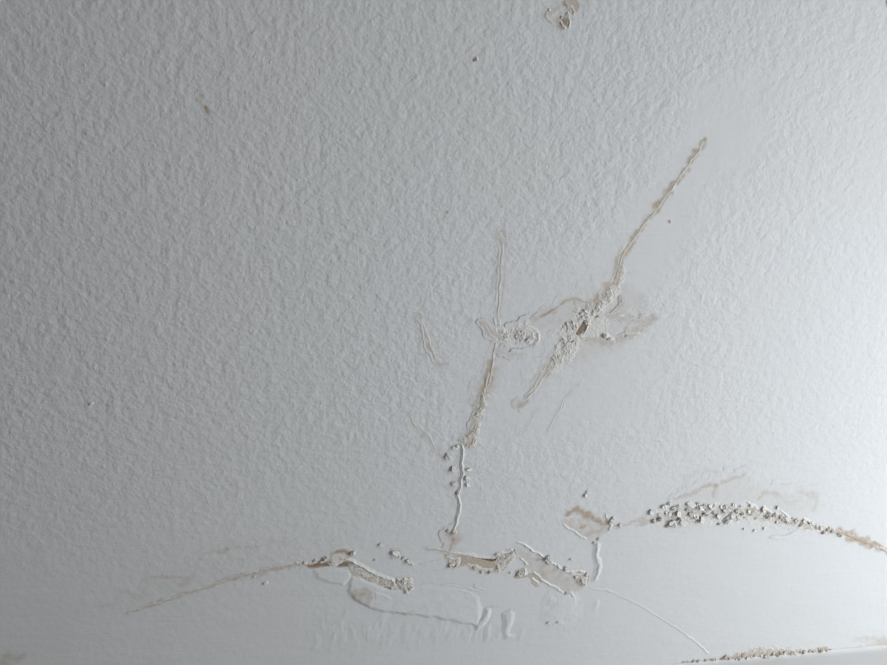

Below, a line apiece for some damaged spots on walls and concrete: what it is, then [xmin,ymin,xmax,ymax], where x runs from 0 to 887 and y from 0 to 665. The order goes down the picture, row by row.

spalling [540,0,582,34]
crack [407,136,709,553]
crack [613,500,887,555]
crack [124,543,415,616]
crack [587,586,830,664]